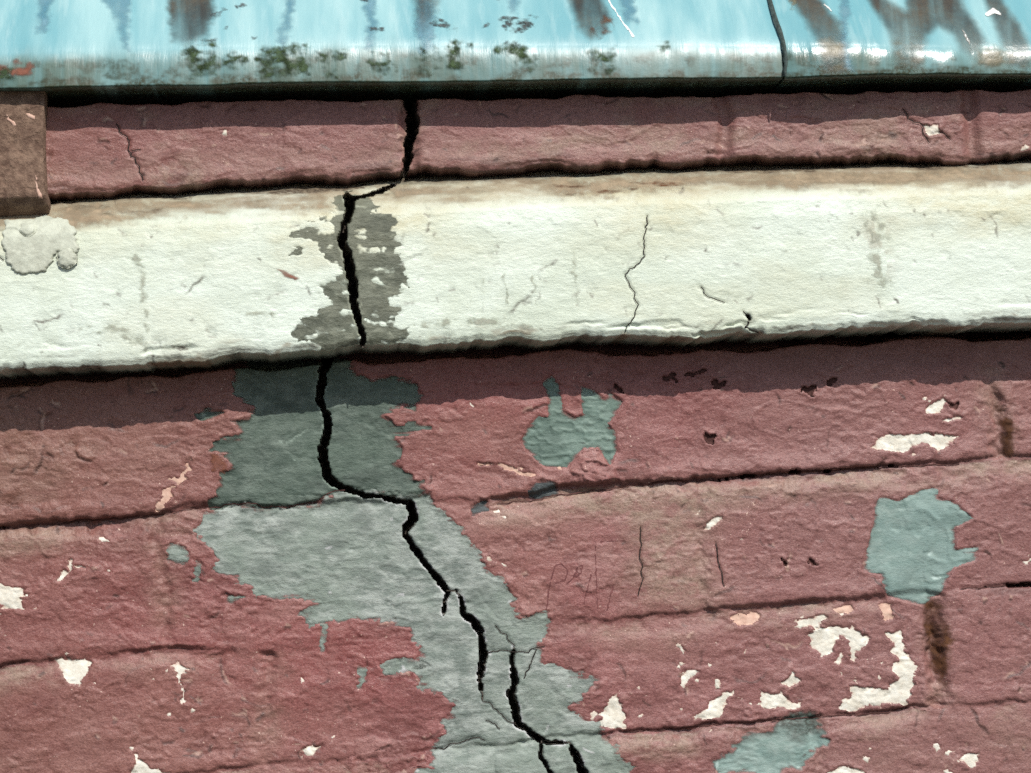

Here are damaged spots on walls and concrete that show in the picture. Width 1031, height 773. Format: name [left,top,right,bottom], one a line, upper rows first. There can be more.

corrosion [0,60,33,75]
crack [116,124,144,180]
crack [338,102,420,348]
peeling [923,395,962,422]
peeling [872,432,959,456]
peeling [166,190,643,773]
crack [0,358,587,773]
peeling [730,611,760,626]
peeling [794,488,979,712]
peeling [676,643,712,688]
peeling [713,671,829,773]
peeling [129,747,162,773]